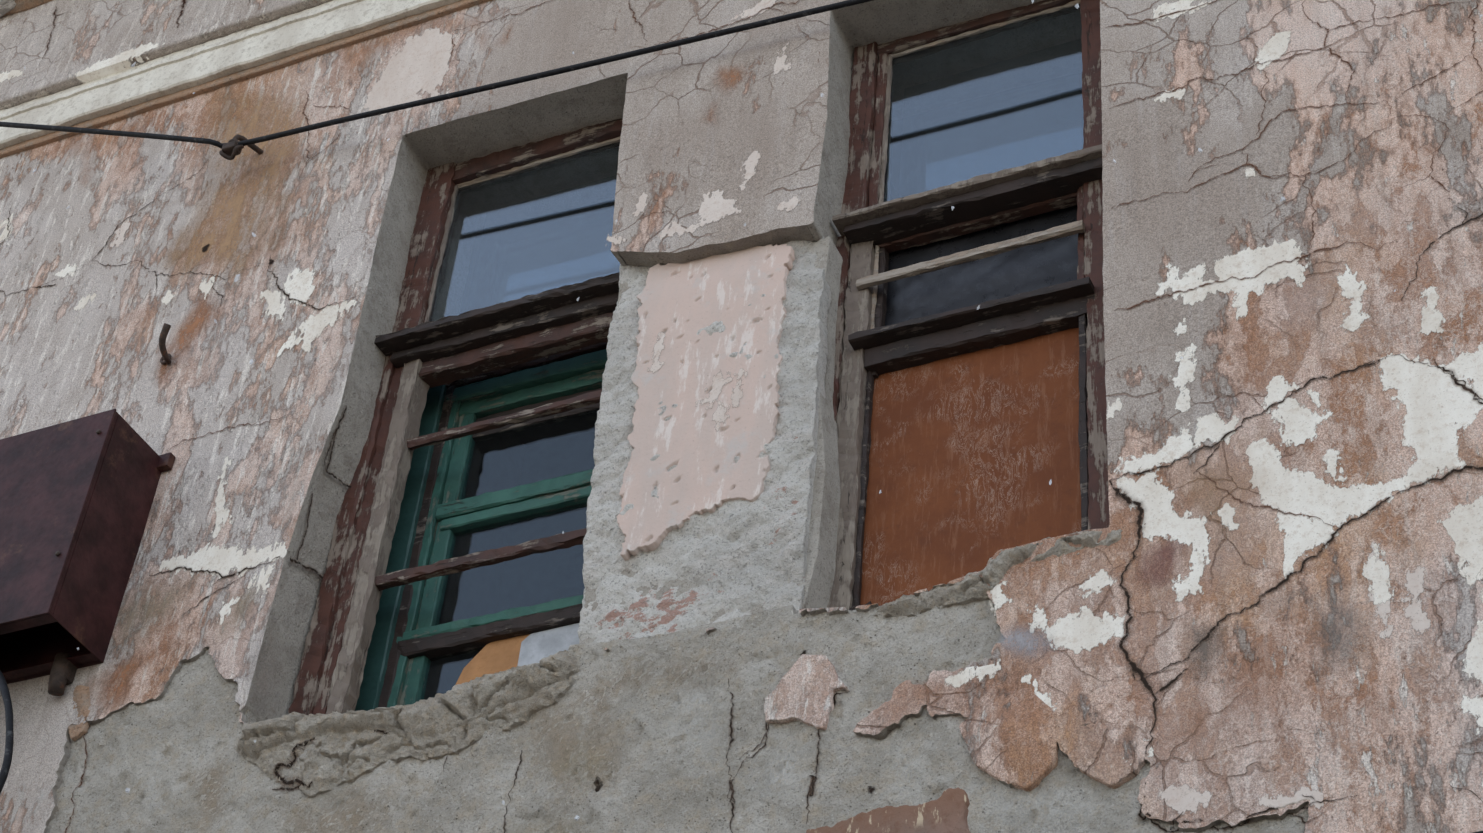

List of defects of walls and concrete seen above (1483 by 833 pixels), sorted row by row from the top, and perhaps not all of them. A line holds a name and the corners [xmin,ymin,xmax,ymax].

peeling [359,27,459,117]
crack [629,0,799,45]
crack [3,165,359,310]
peeling [659,151,761,241]
crack [1105,0,1483,310]
peeling [1113,239,1483,602]
spalling [46,237,1324,833]
crack [1109,354,1483,833]
peeling [1362,542,1431,640]
peeling [1437,495,1483,735]
crack [726,679,769,833]
crack [806,691,850,824]